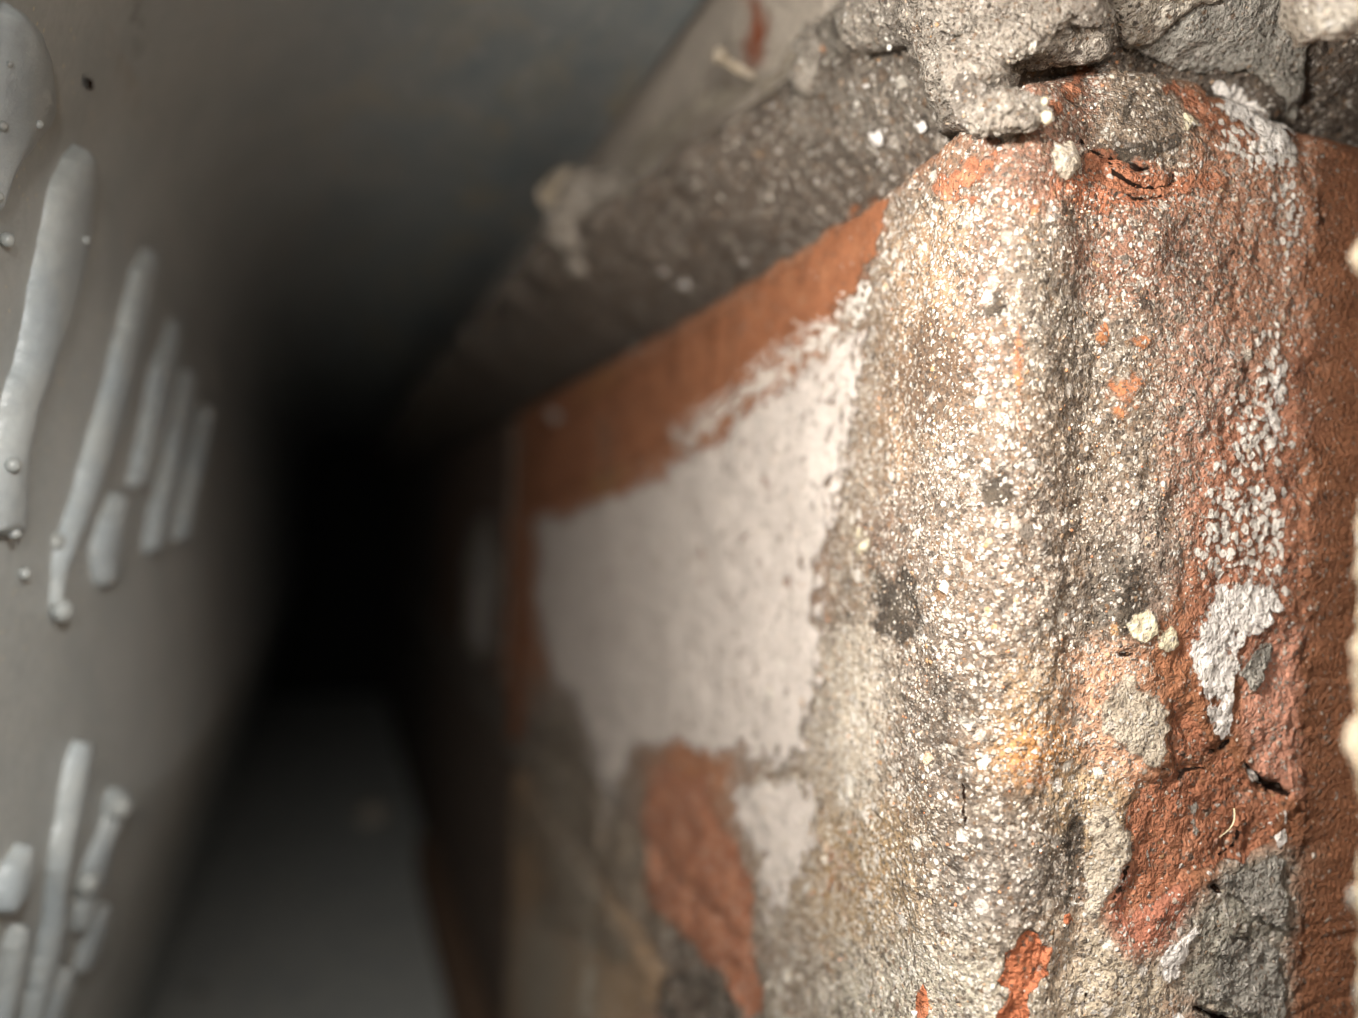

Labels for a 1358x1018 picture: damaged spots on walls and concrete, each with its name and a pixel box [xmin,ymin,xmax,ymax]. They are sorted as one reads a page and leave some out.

peeling [912,120,927,134]
peeling [917,0,1109,204]
flaking render [1161,81,1245,155]
crack [1079,139,1175,200]
spalling [1084,148,1240,198]
flaking render [530,197,889,507]
crack [1162,739,1290,797]
spalling [1121,700,1281,921]
spalling [641,763,763,1018]
spalling [996,930,1053,1018]
crack [1193,1006,1227,1018]